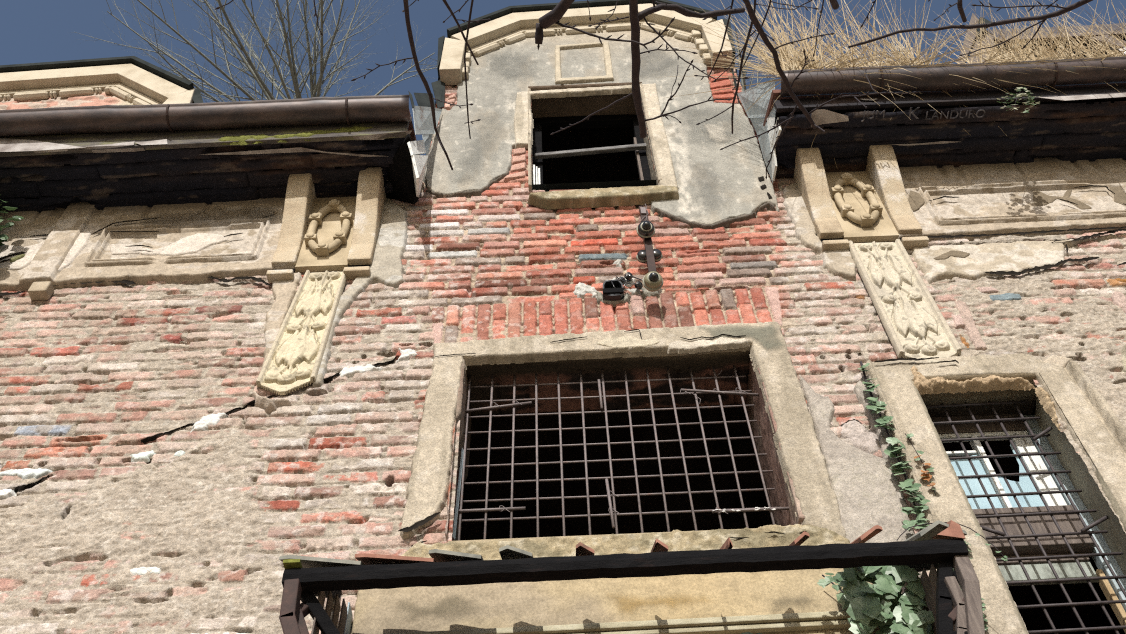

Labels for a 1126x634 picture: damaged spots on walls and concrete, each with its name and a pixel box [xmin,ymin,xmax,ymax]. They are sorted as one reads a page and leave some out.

flaking render [709,72,737,104]
crack [927,185,1126,275]
flaking render [934,250,970,260]
crack [680,333,746,341]
crack [323,348,476,384]
spalling [910,366,1061,430]
crack [141,395,275,444]
crack [0,475,50,499]